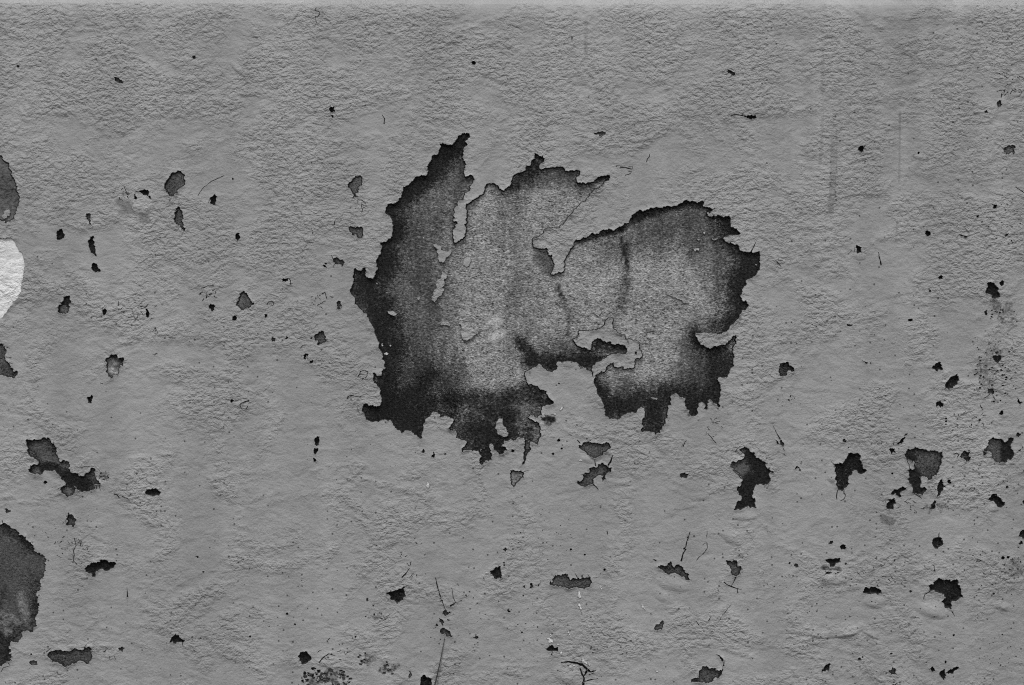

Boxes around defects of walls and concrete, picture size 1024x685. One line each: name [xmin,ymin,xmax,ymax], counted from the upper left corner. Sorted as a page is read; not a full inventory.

peeling [0,155,20,224]
peeling [164,170,185,231]
peeling [0,237,25,319]
peeling [322,133,761,489]
peeling [25,437,109,497]
peeling [730,446,774,511]
peeling [833,439,867,501]
peeling [885,432,1023,511]
peeling [0,508,92,672]
peeling [84,560,116,580]
peeling [923,530,1024,616]
peeling [29,644,125,668]